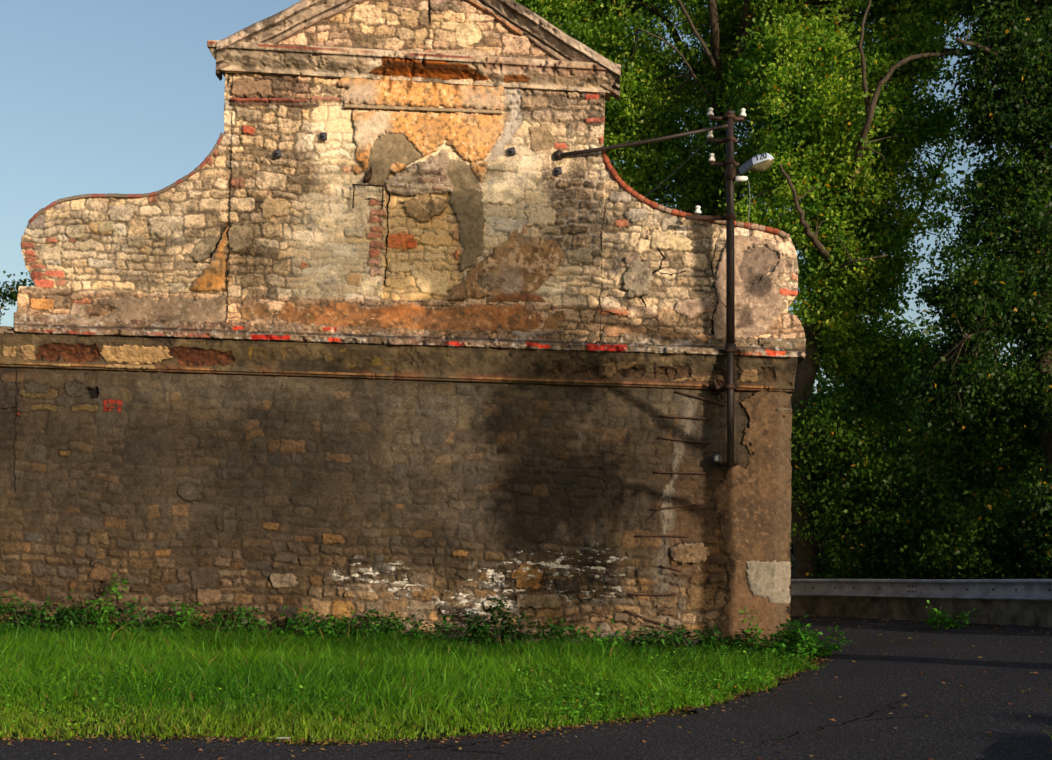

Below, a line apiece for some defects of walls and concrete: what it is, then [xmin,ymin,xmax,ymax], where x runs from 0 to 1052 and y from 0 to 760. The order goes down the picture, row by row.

peeling [69,73,567,332]
crack [599,206,686,337]
crack [711,244,726,334]
peeling [1,342,236,370]
peeling [551,360,724,382]
peeling [710,366,792,647]
efflorescence [332,563,421,609]
efflorescence [432,547,626,615]